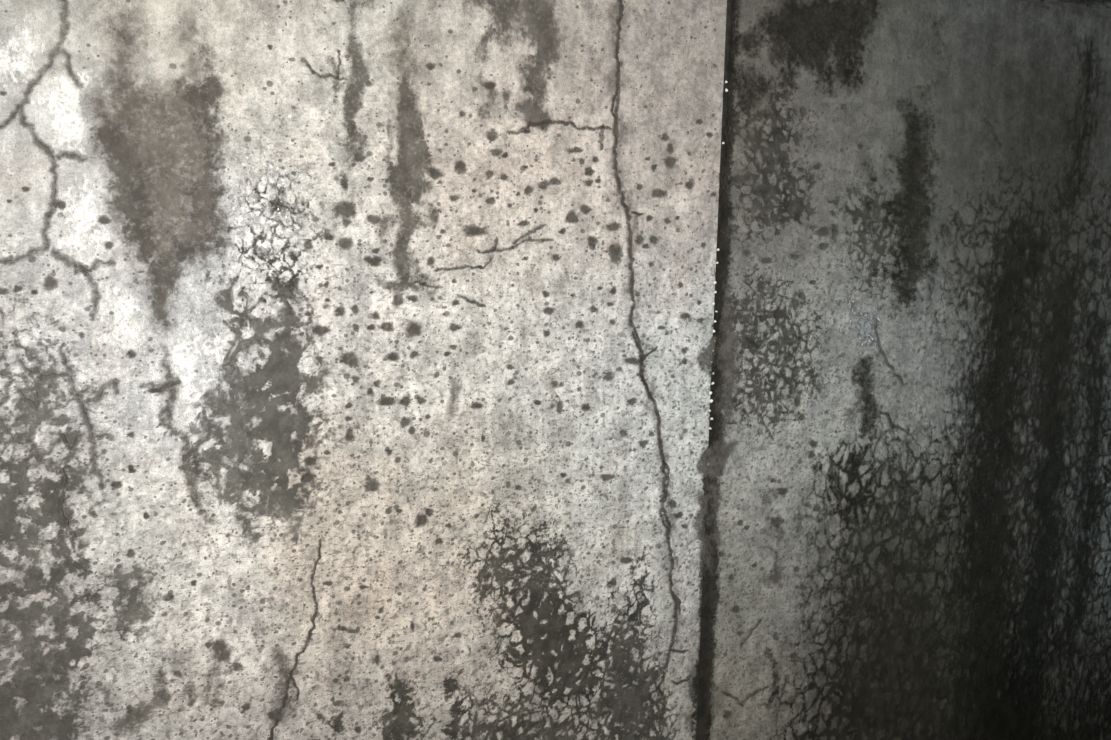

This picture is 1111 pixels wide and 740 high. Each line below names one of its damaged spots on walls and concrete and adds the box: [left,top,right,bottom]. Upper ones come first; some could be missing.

damp [0,20,44,96]
crack [0,0,116,320]
damp [0,276,174,740]
damp [31,30,467,544]
crack [509,0,691,718]
damp [318,0,1111,740]
crack [831,452,900,536]
crack [875,320,904,384]
crack [880,411,905,431]
damp [115,640,243,732]
damp [269,650,296,724]
crack [270,540,322,740]